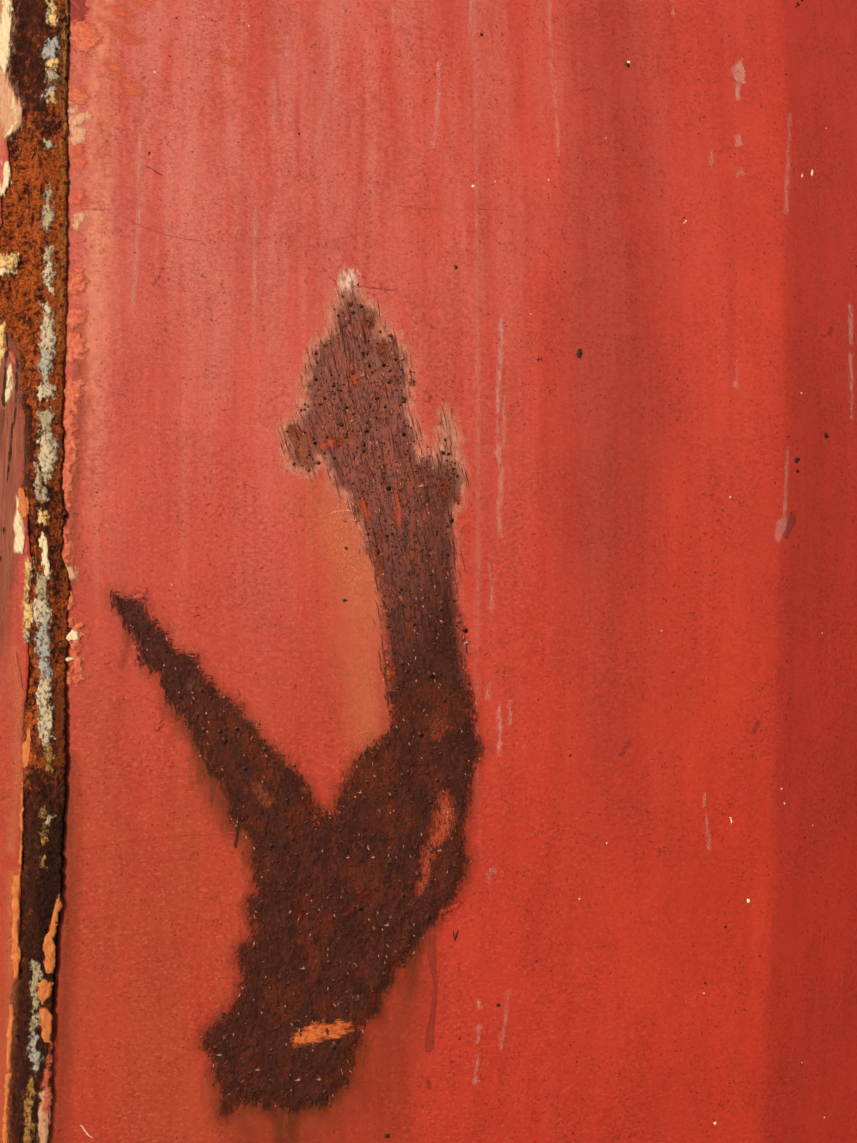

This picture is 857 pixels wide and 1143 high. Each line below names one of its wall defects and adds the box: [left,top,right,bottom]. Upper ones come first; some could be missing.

peeling [0,0,21,138]
peeling [0,161,12,196]
peeling [0,253,19,275]
peeling [0,321,13,402]
rust [110,268,485,1143]